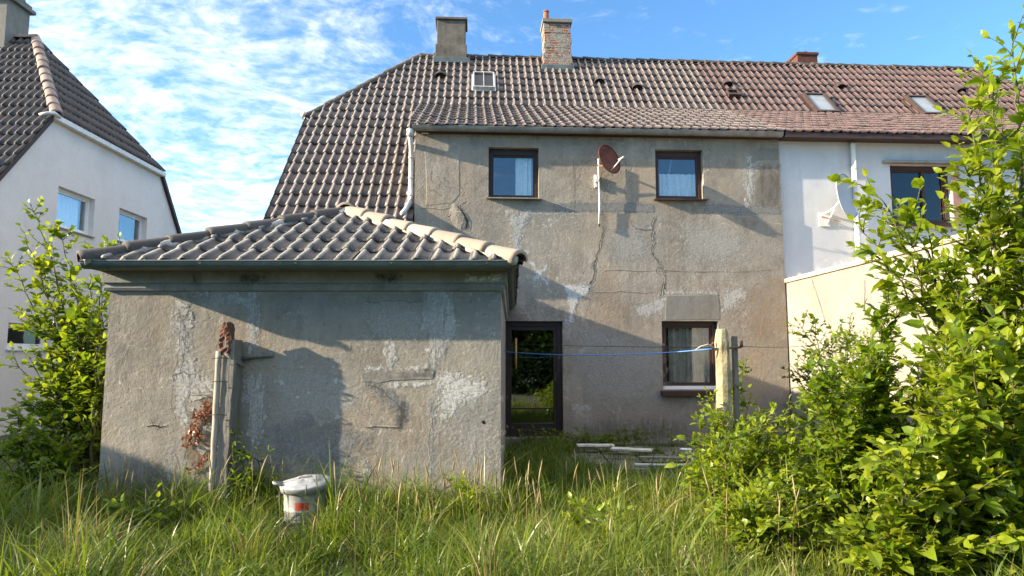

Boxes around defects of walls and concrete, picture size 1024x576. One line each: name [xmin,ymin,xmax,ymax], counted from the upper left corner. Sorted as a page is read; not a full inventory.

crack [588,162,667,298]
peeling [564,283,591,324]
peeling [170,300,220,464]
peeling [383,340,398,367]
peeling [433,370,493,432]